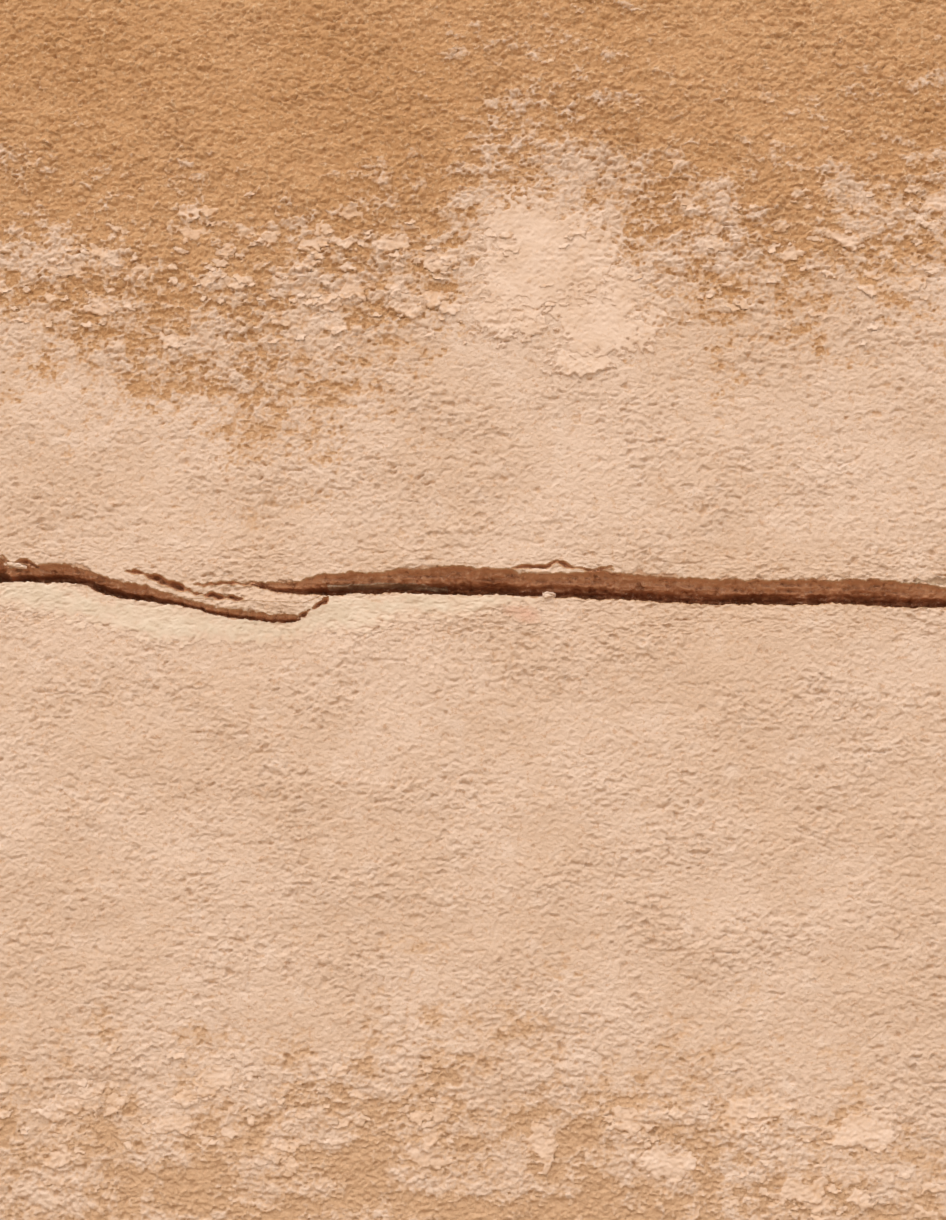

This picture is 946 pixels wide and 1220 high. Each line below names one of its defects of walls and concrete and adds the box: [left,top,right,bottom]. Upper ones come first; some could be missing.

peeling [167,204,219,286]
peeling [671,197,701,211]
peeling [698,204,757,254]
peeling [790,188,812,210]
peeling [767,221,870,279]
peeling [857,185,946,301]
peeling [0,239,152,332]
peeling [192,182,692,378]
peeling [694,281,756,313]
peeling [154,332,187,350]
crack [0,555,946,623]